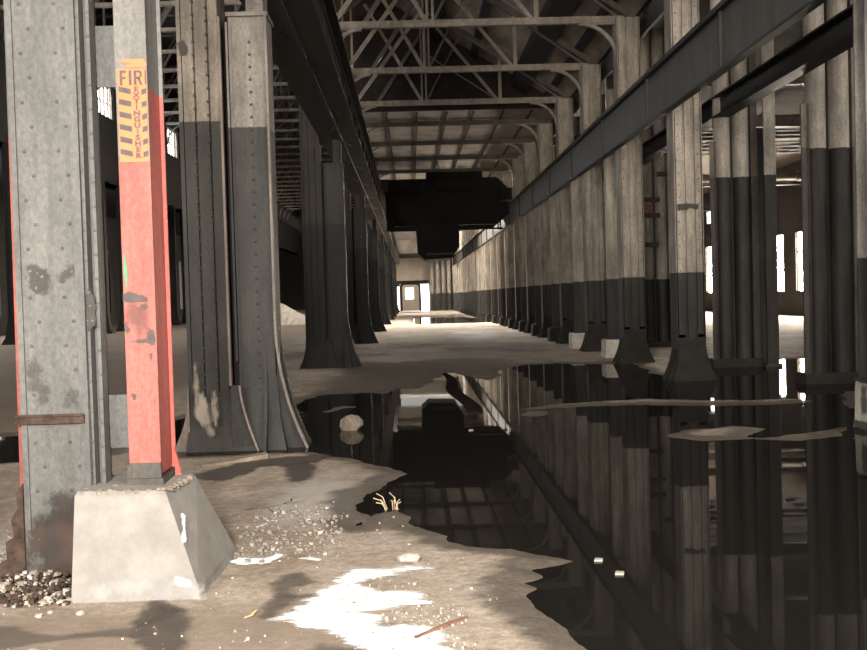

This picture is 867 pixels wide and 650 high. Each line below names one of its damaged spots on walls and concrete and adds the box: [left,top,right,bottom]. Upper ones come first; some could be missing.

peeling [123,292,156,358]
peeling [194,368,218,436]